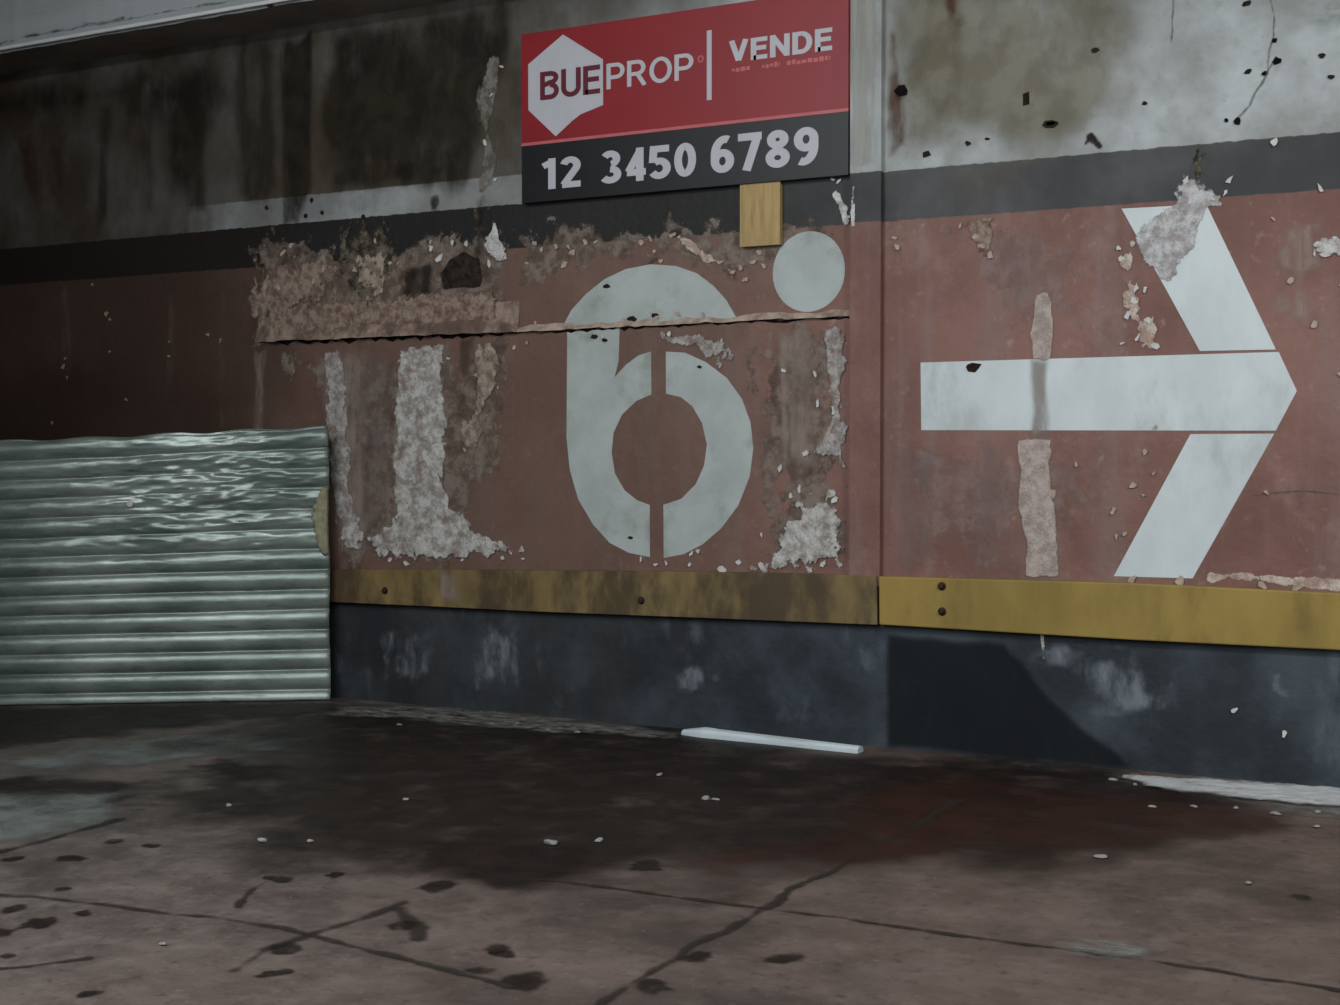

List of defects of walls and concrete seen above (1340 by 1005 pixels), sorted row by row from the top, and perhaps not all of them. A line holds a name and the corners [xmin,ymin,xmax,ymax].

water stain [239,34,311,222]
water stain [325,3,506,209]
water stain [889,0,1122,142]
crack [1224,18,1281,125]
peeling [248,203,829,346]
peeling [1116,149,1233,349]
peeling [282,339,399,569]
peeling [659,319,848,574]
peeling [1018,293,1059,577]
crack [0,818,124,852]
crack [0,887,515,988]
crack [508,800,1340,1005]